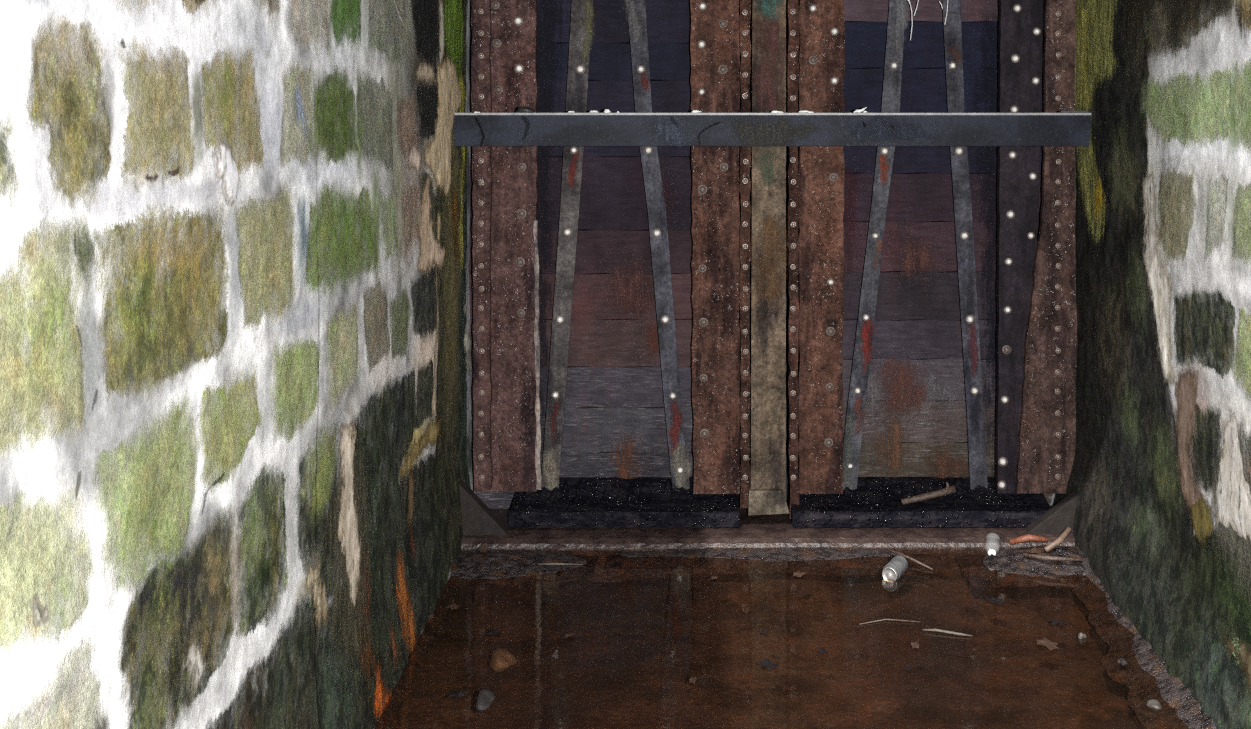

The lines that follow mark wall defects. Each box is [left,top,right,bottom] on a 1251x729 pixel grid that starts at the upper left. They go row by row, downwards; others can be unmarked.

corrosion [358,564,388,714]
corrosion [391,539,415,656]